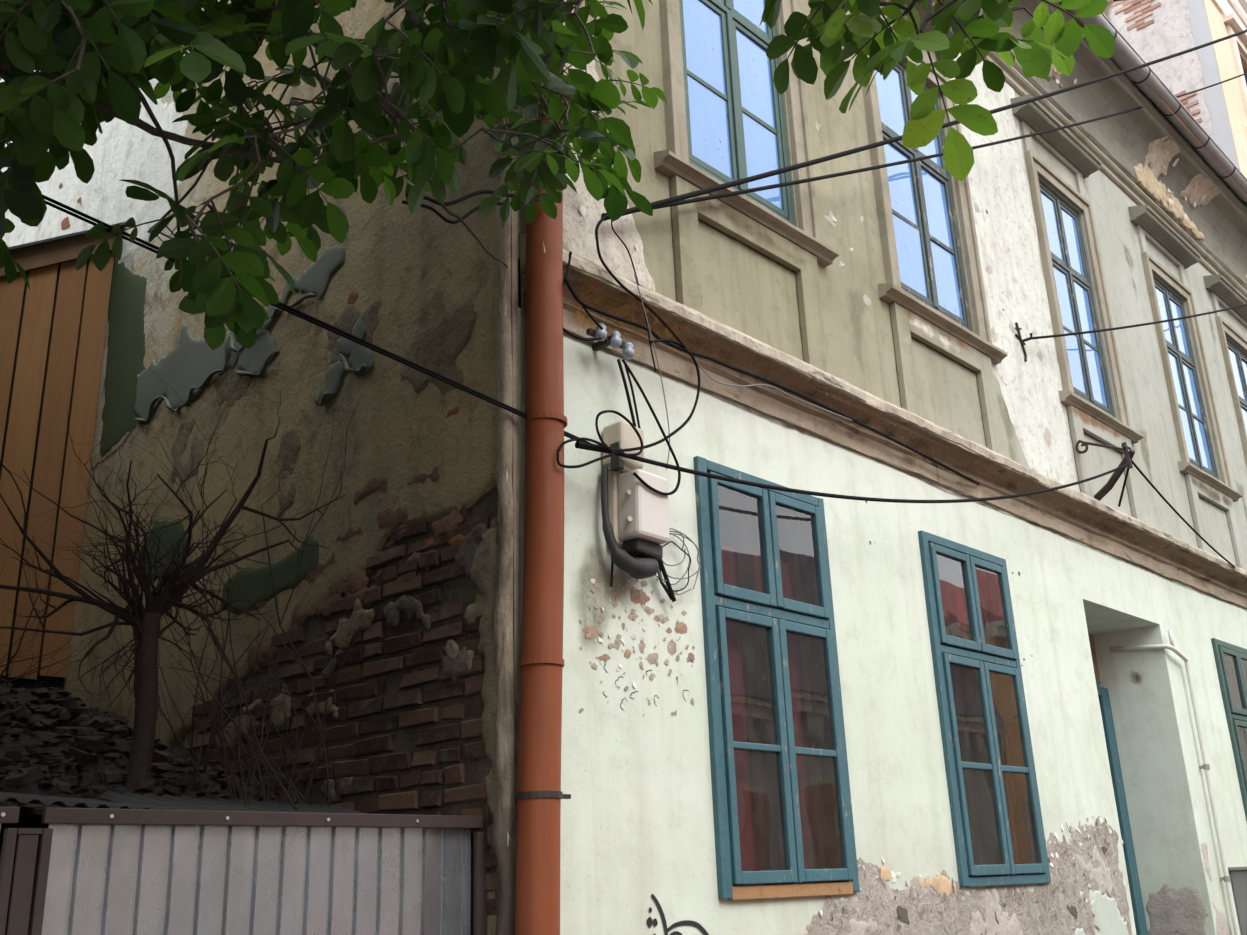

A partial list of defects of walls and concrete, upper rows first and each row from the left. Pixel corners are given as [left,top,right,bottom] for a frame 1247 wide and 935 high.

flaking render [1109,0,1161,31]
flaking render [1175,90,1204,129]
spalling [1134,136,1220,241]
peeling [134,246,345,491]
spalling [314,299,381,407]
flaking render [354,477,387,506]
peeling [580,574,695,715]
flaking render [183,504,502,915]
flaking render [801,815,1132,935]
flaking render [1146,884,1232,935]